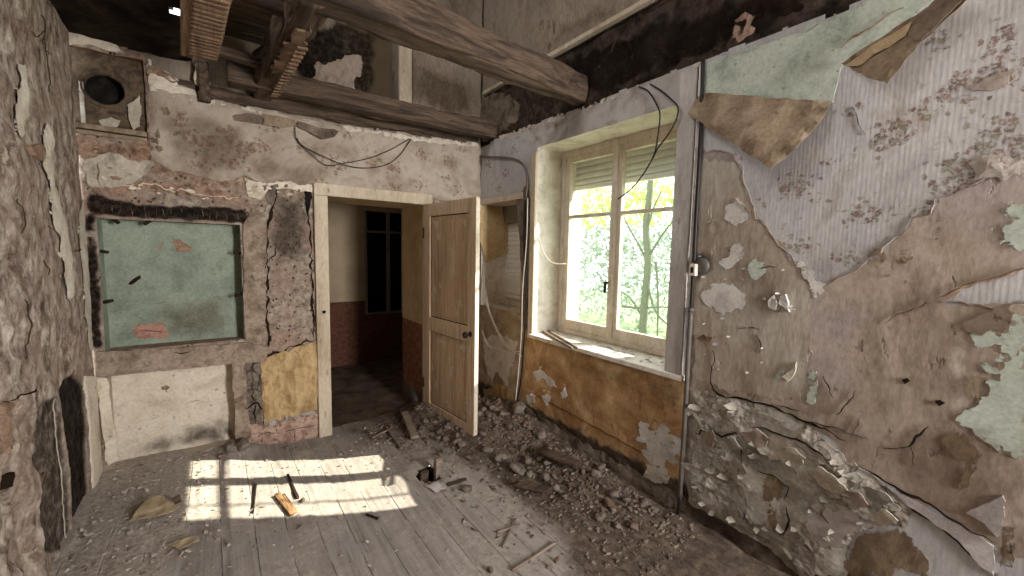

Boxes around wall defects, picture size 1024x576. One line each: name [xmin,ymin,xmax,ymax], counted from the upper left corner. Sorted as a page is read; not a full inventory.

flaking render [690,0,933,103]
spalling [26,143,46,161]
flaking render [76,129,163,190]
flaking render [991,200,1024,251]
crack [254,189,316,365]
spalling [0,400,16,454]
flaking render [244,362,319,445]
peeling [524,158,914,576]
crack [710,352,864,441]
flaking render [955,314,1024,459]
spalling [0,472,15,490]
crack [859,466,994,557]